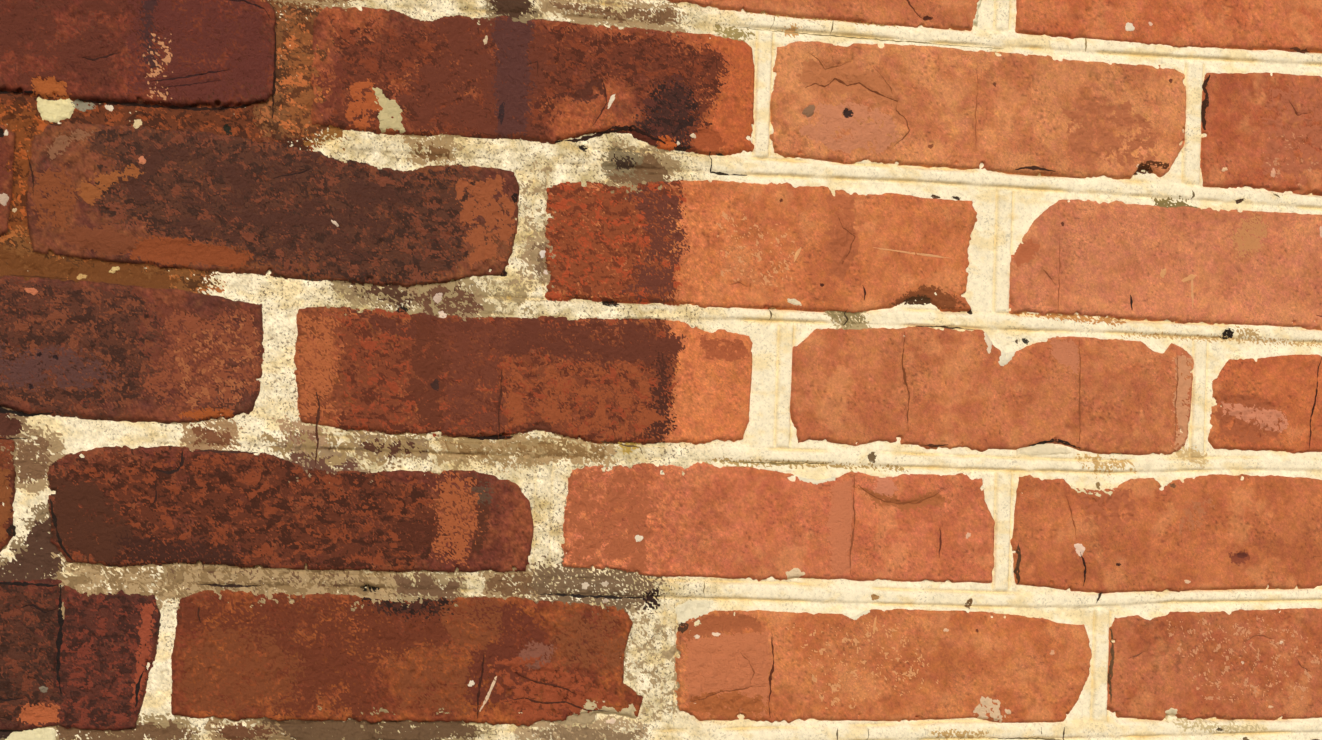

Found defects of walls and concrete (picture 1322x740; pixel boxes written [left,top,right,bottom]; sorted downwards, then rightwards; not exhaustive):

leakage [594,136,684,200]
spalling [1210,392,1291,444]
crack [1309,358,1322,448]
crack [1066,497,1103,603]